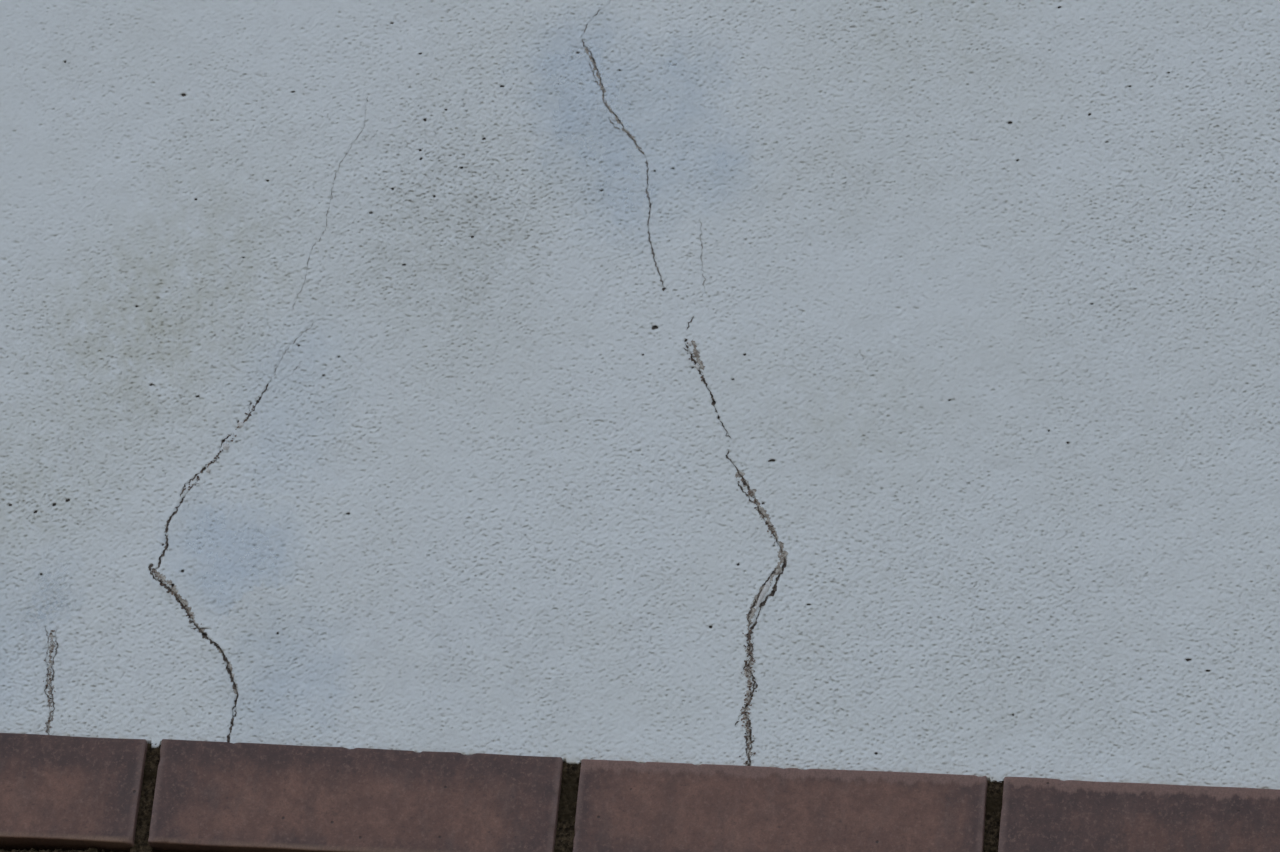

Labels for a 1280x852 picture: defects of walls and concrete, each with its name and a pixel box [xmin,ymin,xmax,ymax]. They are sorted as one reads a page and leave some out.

crack [43,628,58,735]
crack [148,96,368,742]
crack [582,8,665,291]
crack [684,219,788,766]